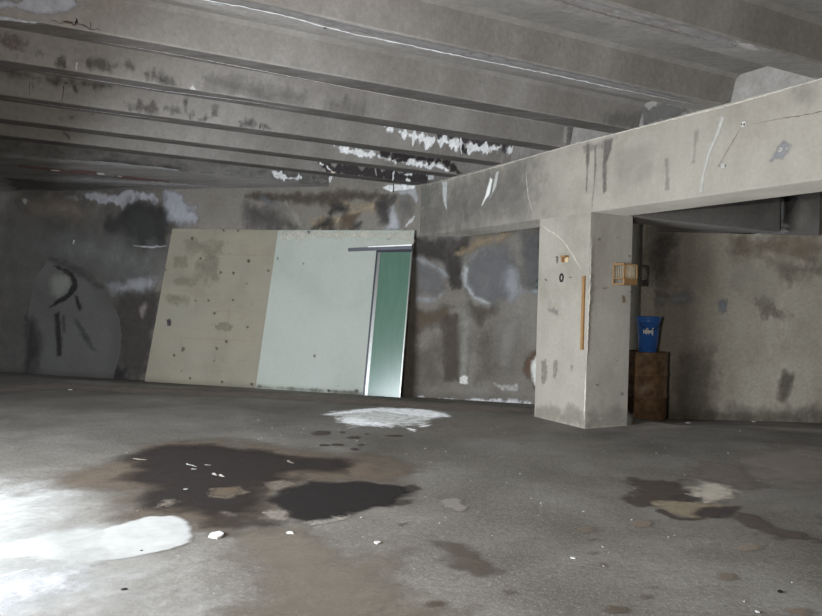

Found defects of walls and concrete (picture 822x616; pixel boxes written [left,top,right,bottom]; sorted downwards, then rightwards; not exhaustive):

damp [0,0,77,24]
damp [164,0,822,230]
crack [719,111,822,164]
damp [1,154,180,171]
damp [10,177,228,225]
damp [414,232,539,384]
damp [466,383,532,404]